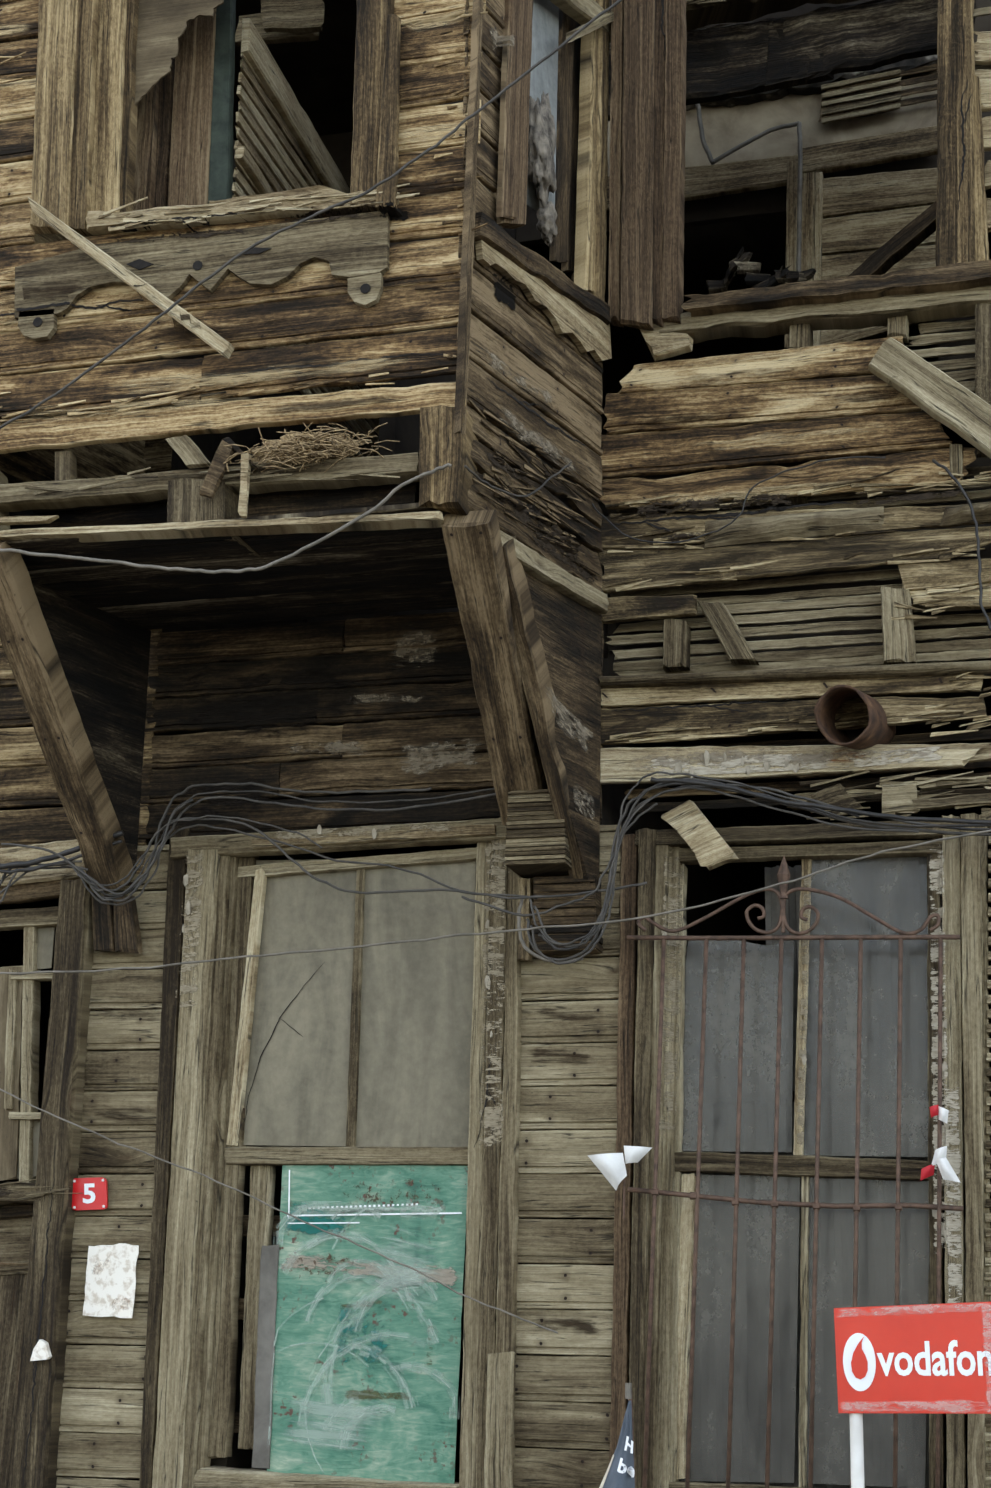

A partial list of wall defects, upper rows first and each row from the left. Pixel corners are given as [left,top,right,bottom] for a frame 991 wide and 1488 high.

peeling [479,843,510,1147]
peeling [929,849,963,1303]